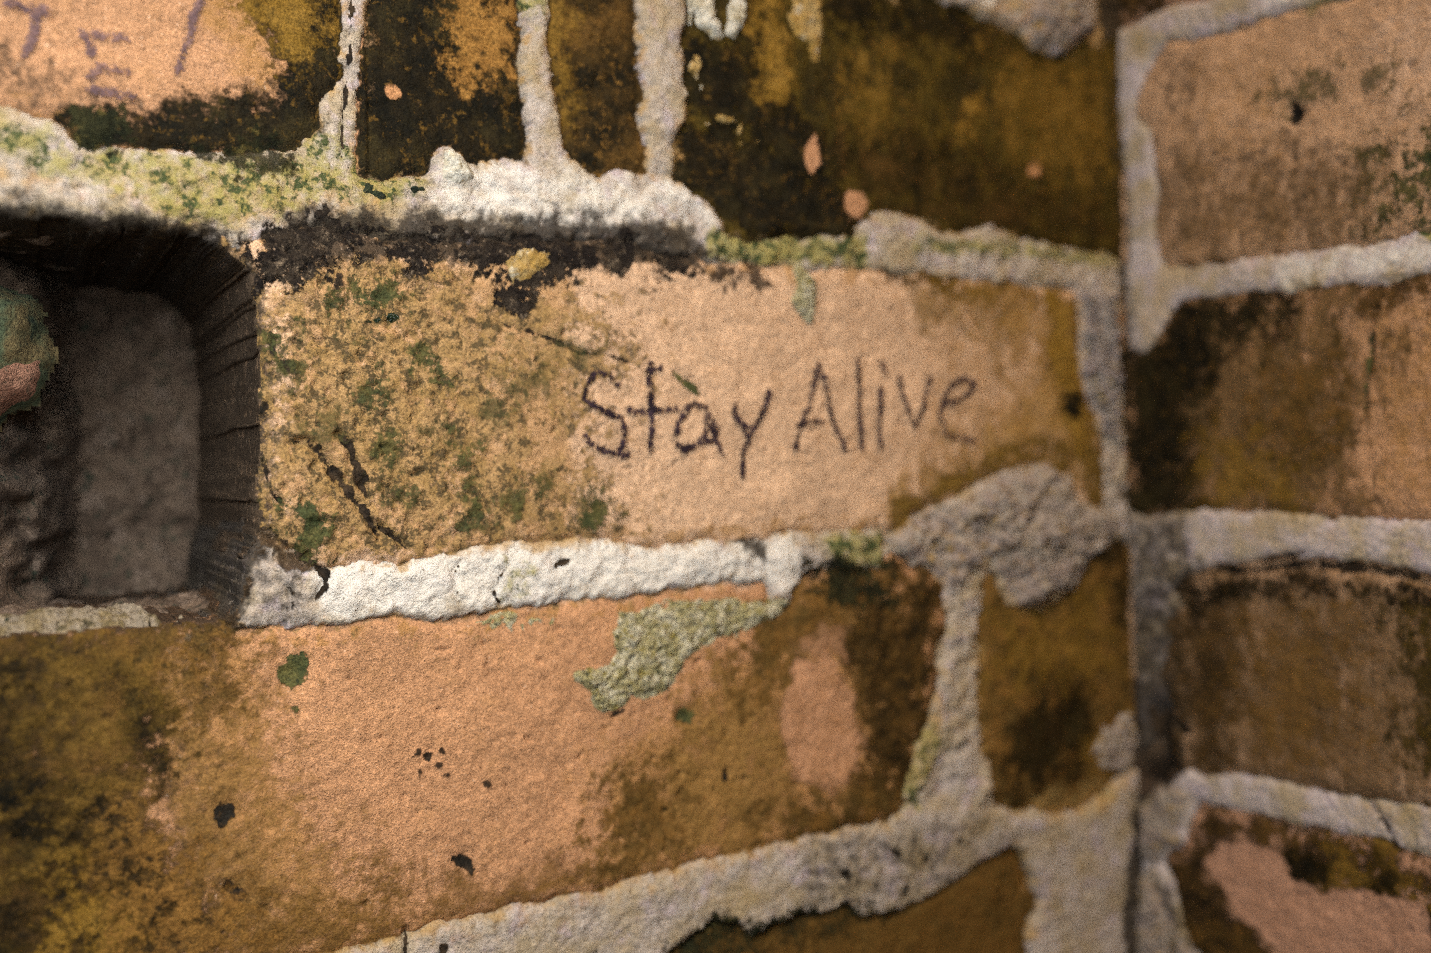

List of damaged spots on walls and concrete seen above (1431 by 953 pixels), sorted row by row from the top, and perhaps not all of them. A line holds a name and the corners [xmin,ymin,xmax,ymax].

damp [672,0,1168,261]
peeling [242,236,310,294]
spalling [334,273,344,290]
spalling [268,331,295,374]
spalling [0,254,200,609]
damp [1119,274,1431,520]
spalling [254,528,318,572]
spalling [180,576,253,661]
damp [569,551,946,892]